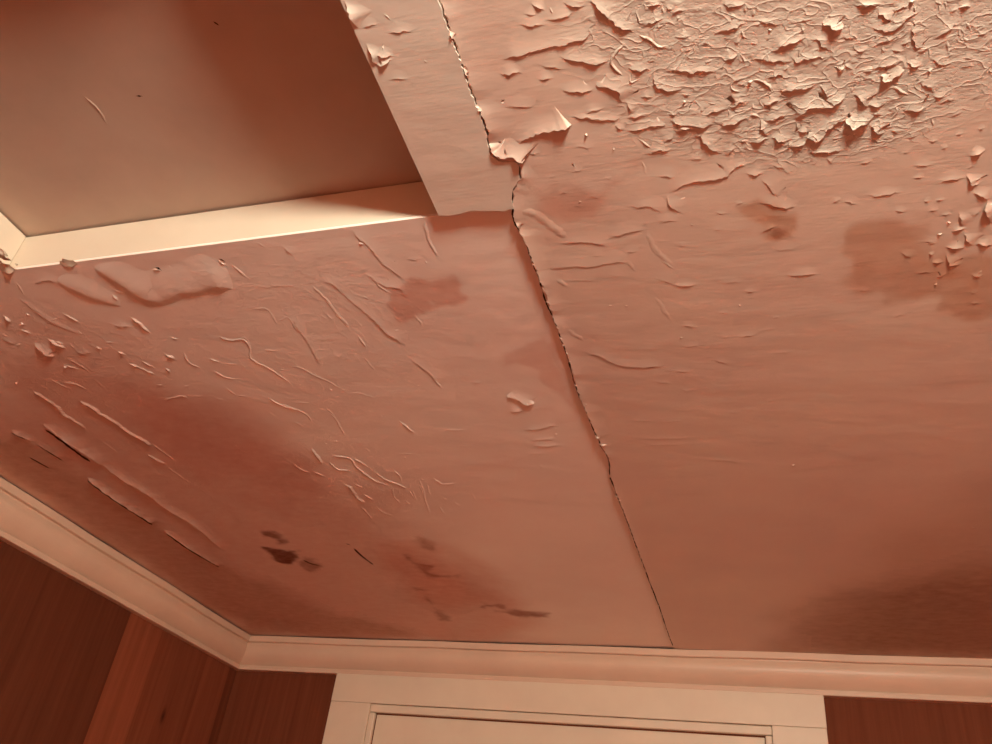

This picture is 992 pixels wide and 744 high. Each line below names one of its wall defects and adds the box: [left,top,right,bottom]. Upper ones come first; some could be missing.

peeling [498,61,524,76]
peeling [510,107,571,144]
peeling [559,0,992,285]
crack [440,0,673,645]
peeling [10,391,229,566]
leakage [265,548,294,564]